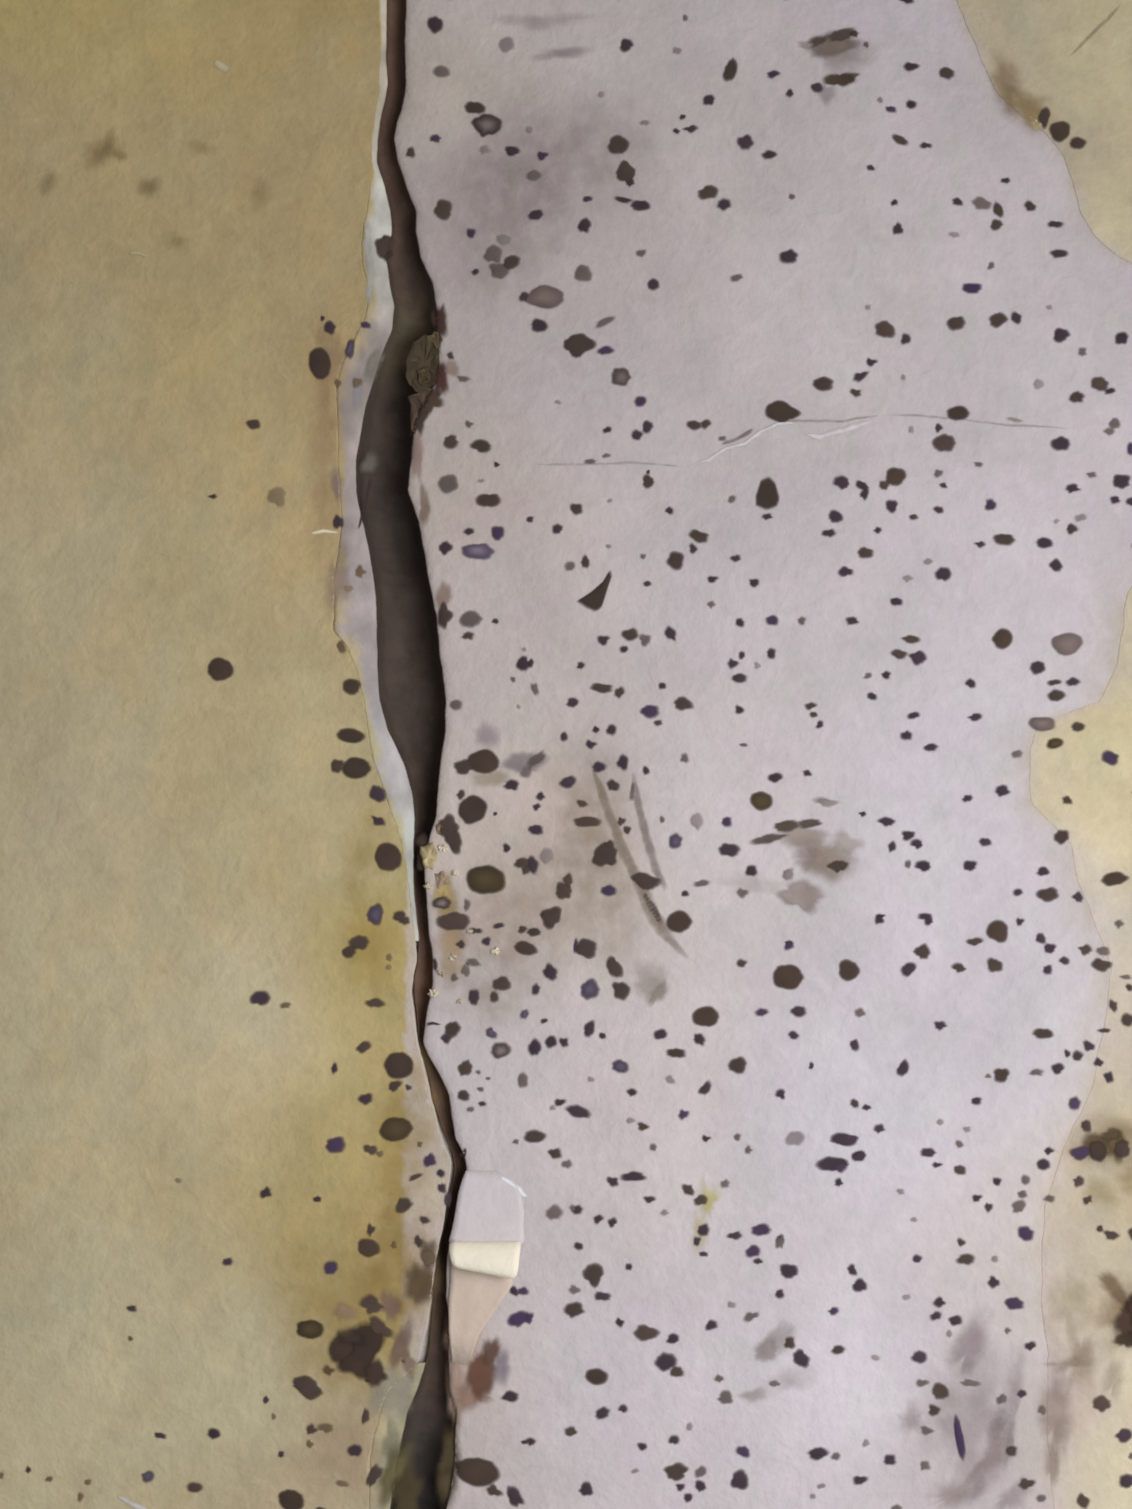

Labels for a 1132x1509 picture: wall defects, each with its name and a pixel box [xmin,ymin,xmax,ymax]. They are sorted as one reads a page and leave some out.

mould [332,728,401,870]
crack [356,0,467,1509]
damp [439,731,544,853]
peeling [333,0,1132,1509]
damp [719,773,855,911]
damp [1030,633,1084,748]
damp [433,792,572,1058]
damp [655,1007,719,1057]
damp [774,941,806,1039]
damp [817,1133,866,1186]
damp [1013,1097,1132,1240]
damp [293,1199,438,1423]